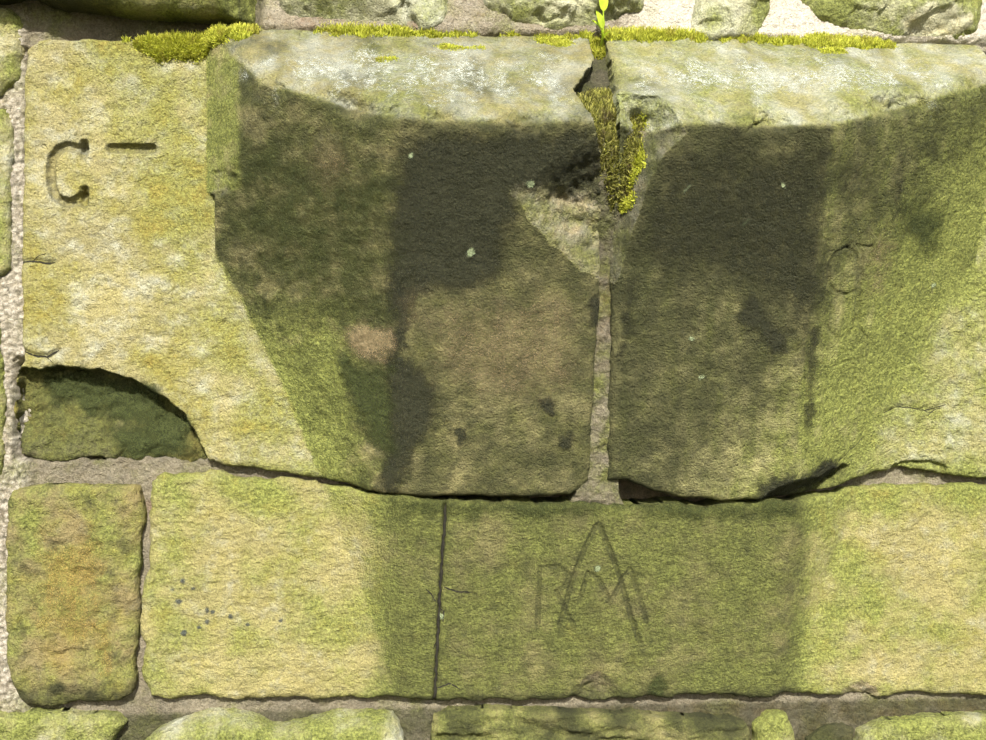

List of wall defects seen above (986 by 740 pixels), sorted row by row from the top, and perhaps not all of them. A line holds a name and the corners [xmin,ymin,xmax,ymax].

crack [426,504,473,700]